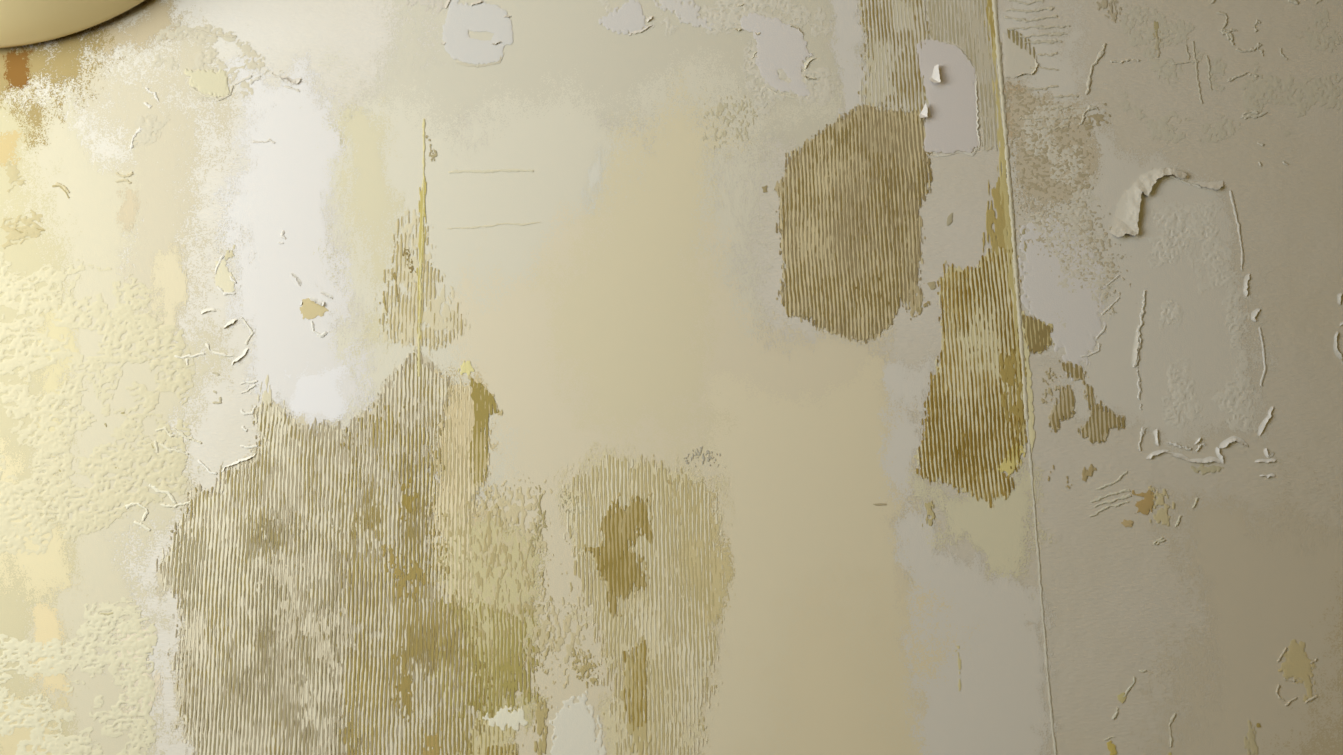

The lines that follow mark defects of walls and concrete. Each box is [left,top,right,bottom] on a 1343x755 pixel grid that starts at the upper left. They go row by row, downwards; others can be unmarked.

peeling [440,0,513,68]
peeling [916,39,980,157]
peeling [1110,168,1223,237]
peeling [290,272,333,320]
peeling [1146,406,1276,478]